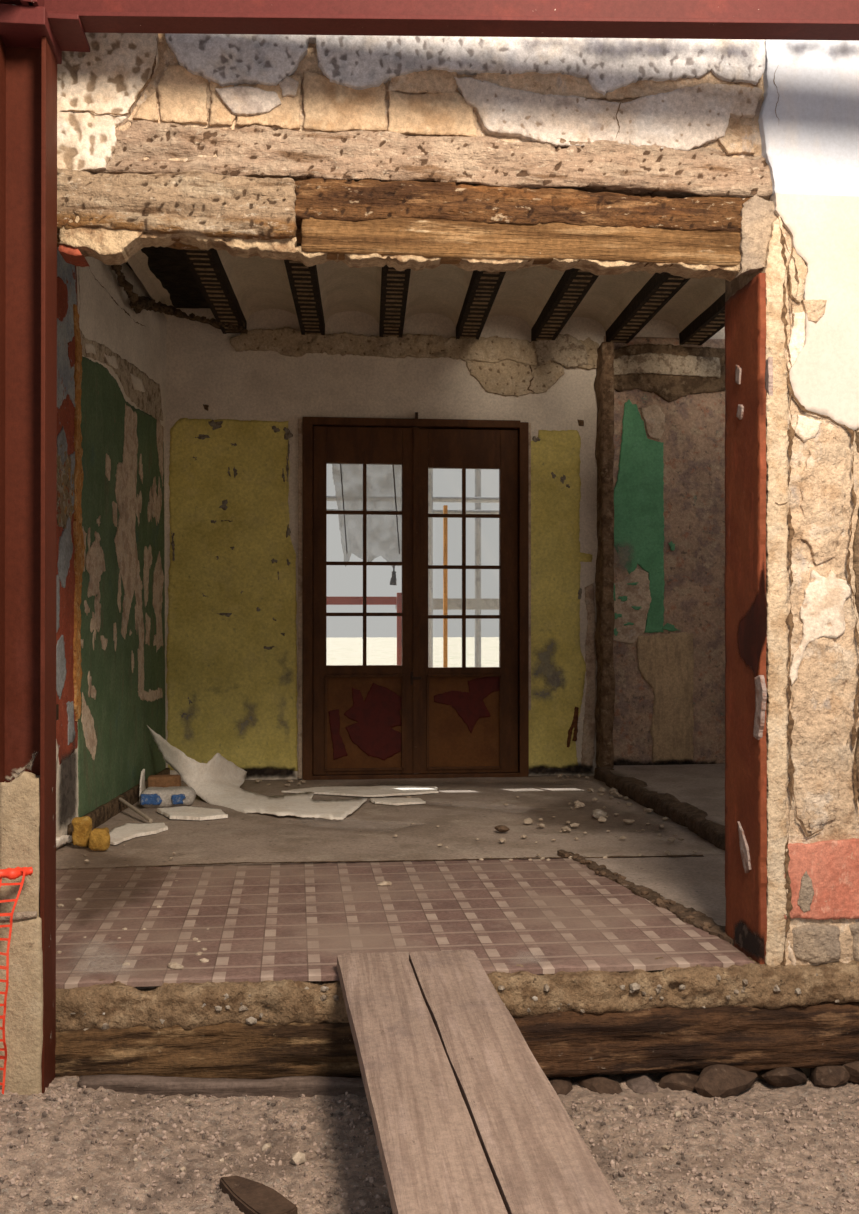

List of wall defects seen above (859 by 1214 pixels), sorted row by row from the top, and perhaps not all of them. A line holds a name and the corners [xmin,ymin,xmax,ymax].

flaking render [115,33,764,158]
flaking render [56,216,741,767]
flaking render [765,225,859,844]
peeling [753,675,767,740]
peeling [737,821,751,873]
flaking render [785,918,859,966]